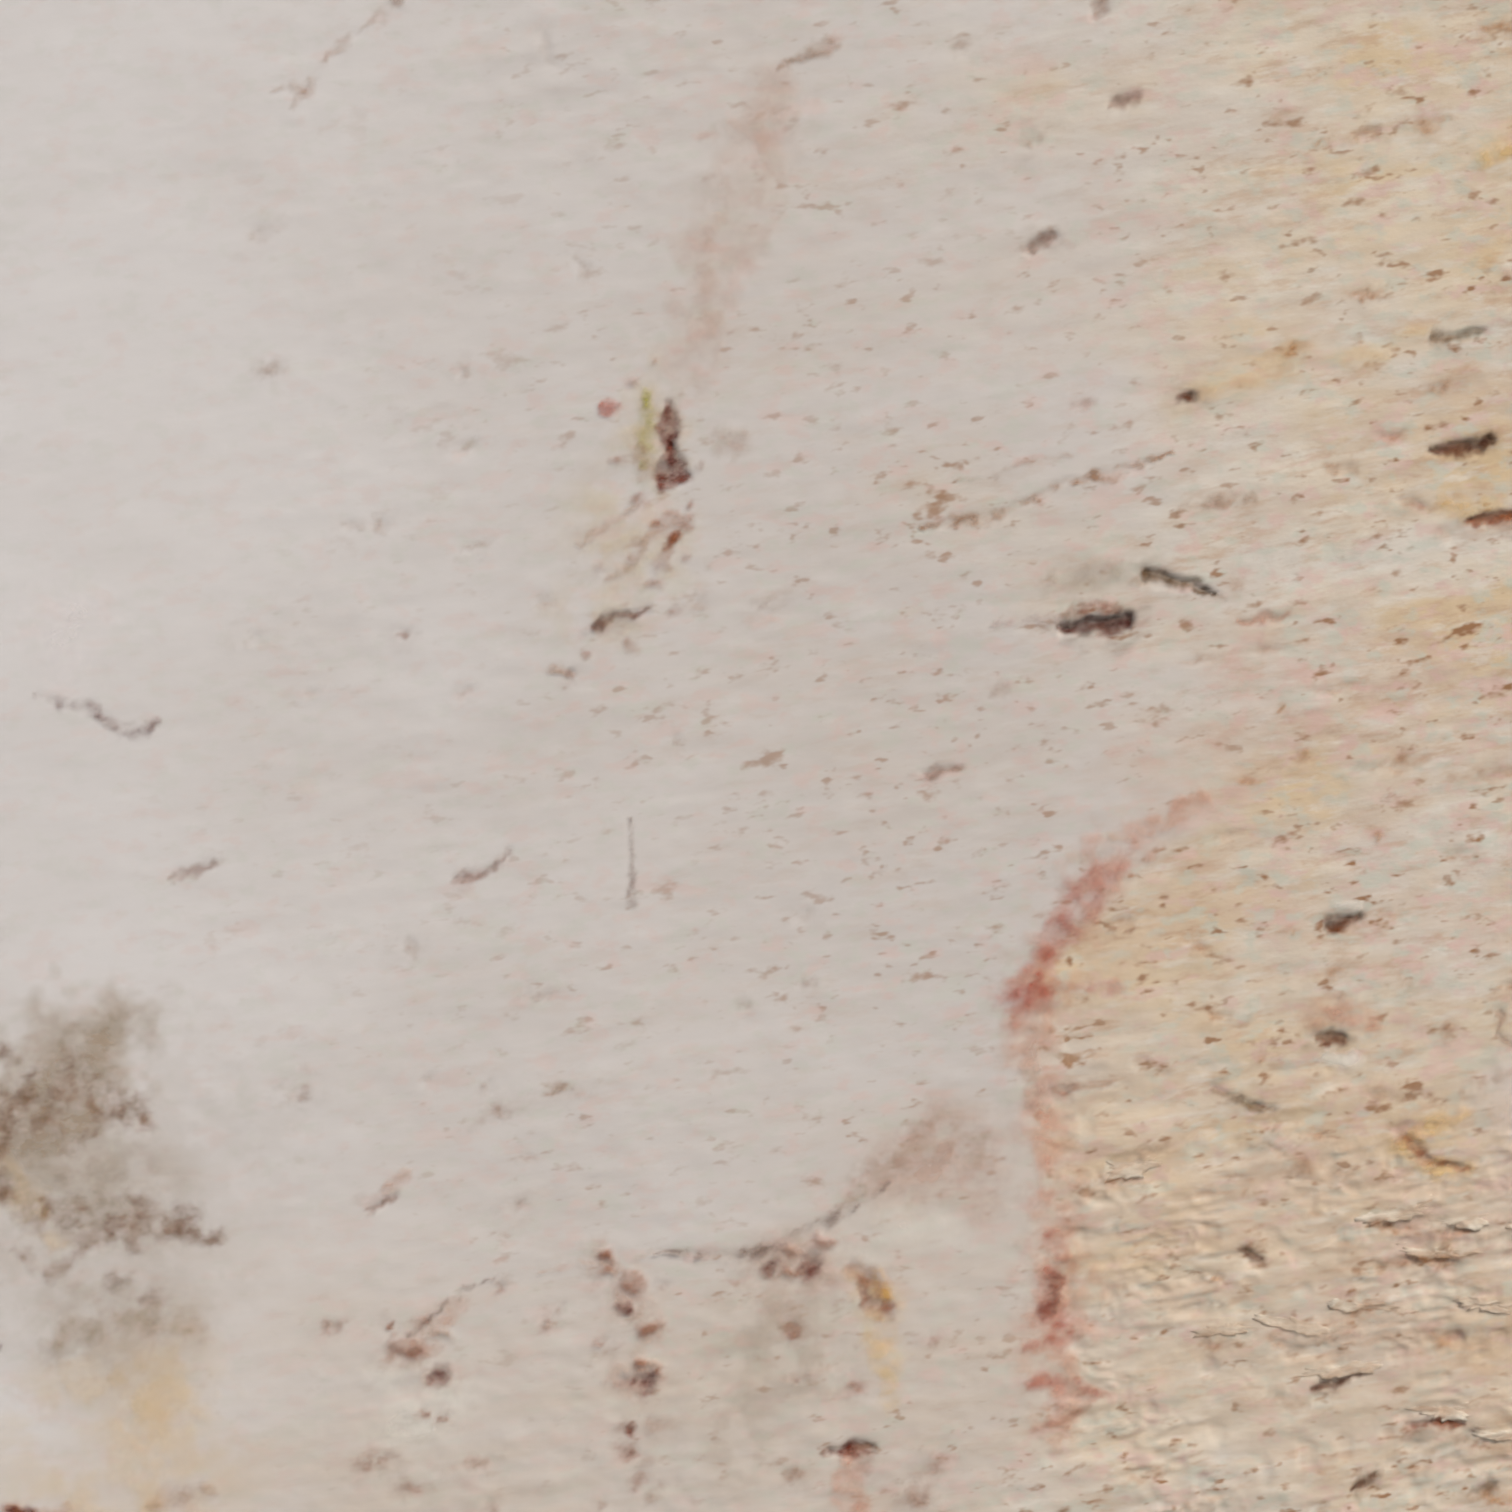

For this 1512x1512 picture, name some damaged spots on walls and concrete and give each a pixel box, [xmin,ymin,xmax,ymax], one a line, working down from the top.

water stain [0,1015,117,1168]